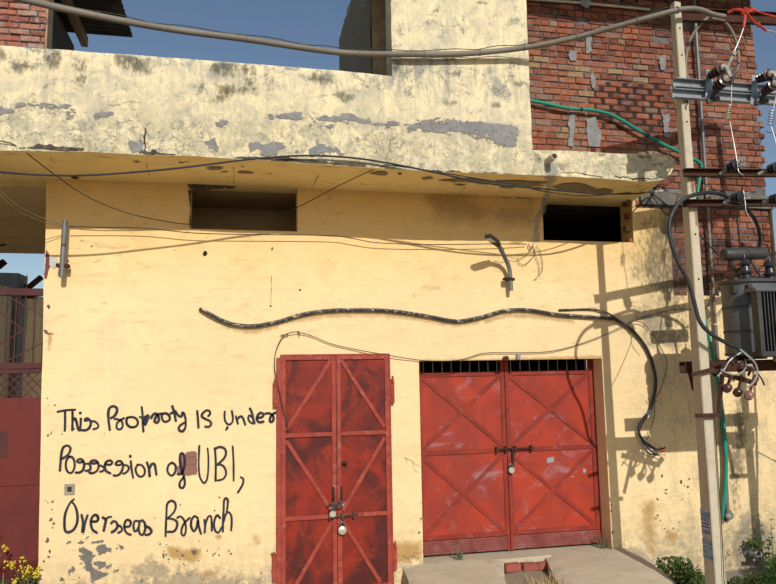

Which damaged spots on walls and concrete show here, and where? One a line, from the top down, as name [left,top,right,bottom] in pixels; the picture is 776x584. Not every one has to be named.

peeling [0,100,78,120]
peeling [92,109,114,121]
peeling [128,140,188,163]
peeling [204,138,219,152]
peeling [235,141,388,176]
peeling [265,111,521,148]
water stain [645,210,682,298]
water stain [641,309,686,346]
peeling [60,532,124,583]
water stain [728,512,776,570]